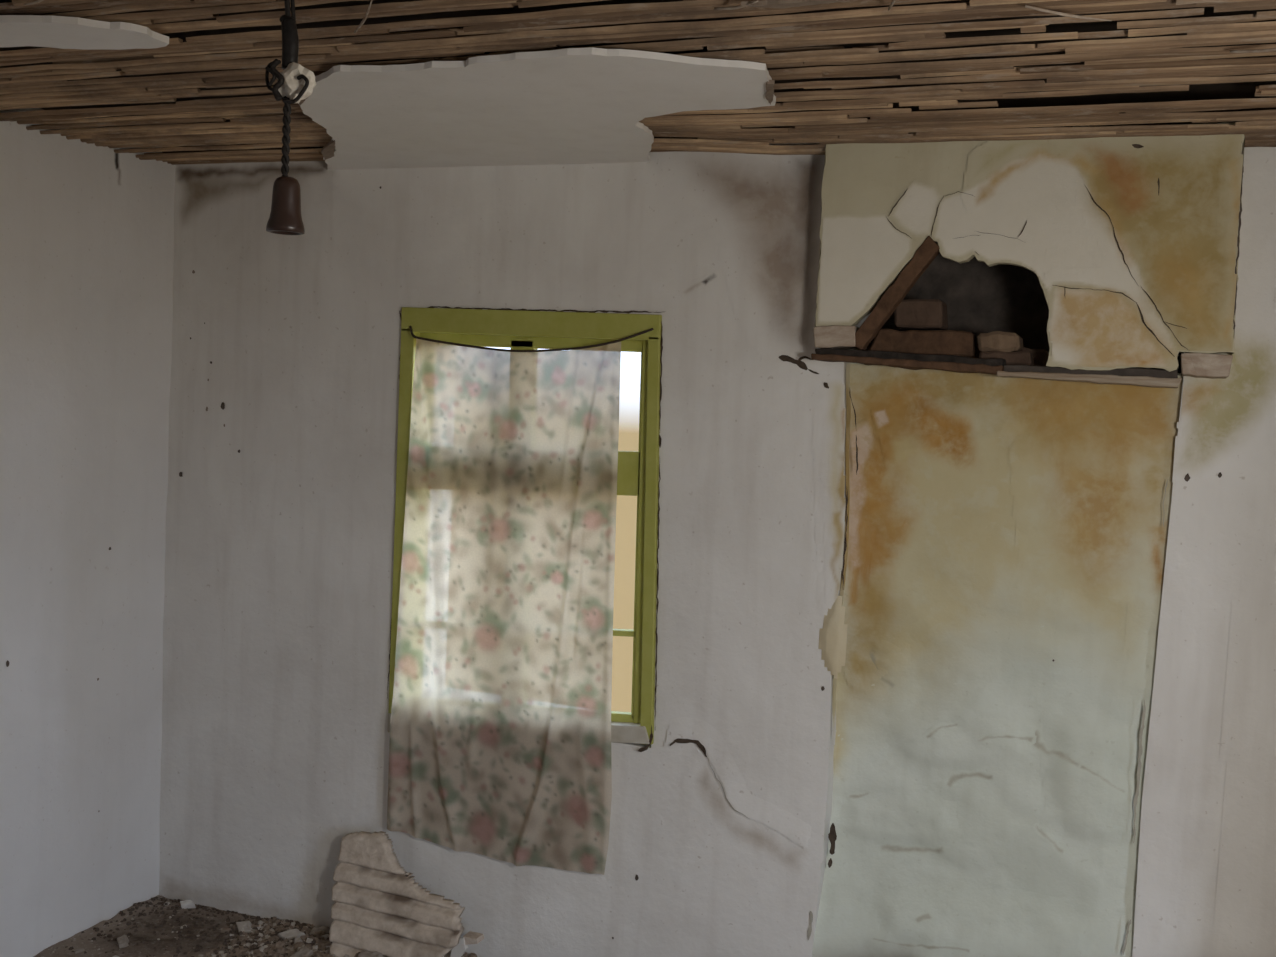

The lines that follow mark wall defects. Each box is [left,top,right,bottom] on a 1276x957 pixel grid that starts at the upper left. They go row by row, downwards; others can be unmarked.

damp [772,143,825,368]
peeling [886,179,946,240]
peeling [1048,307,1100,368]
crack [1054,186,1188,357]
damp [832,123,1276,805]